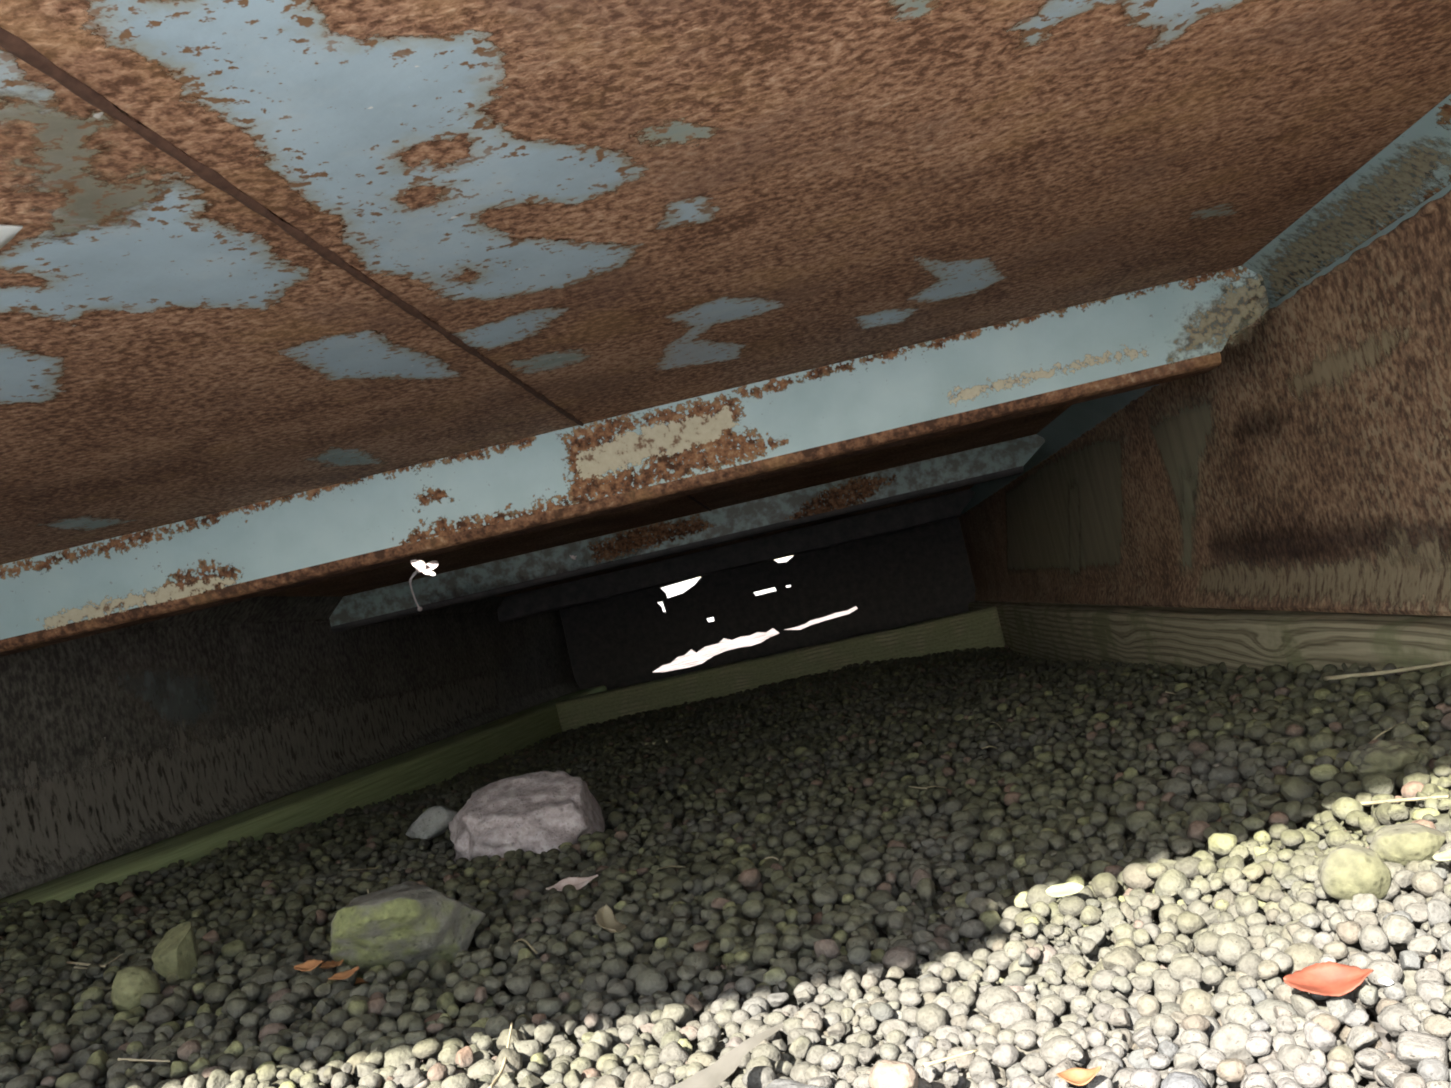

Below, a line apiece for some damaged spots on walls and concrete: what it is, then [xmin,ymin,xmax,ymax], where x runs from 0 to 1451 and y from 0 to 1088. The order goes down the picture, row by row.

peeling [1007,0,1250,50]
peeling [0,50,310,327]
peeling [80,0,723,381]
peeling [853,255,1007,331]
peeling [0,343,67,404]
peeling [656,297,788,371]
rust [0,99,1451,580]
peeling [306,447,388,467]
peeling [575,405,739,481]
peeling [36,515,136,531]
peeling [36,576,239,630]
rust [151,559,242,604]